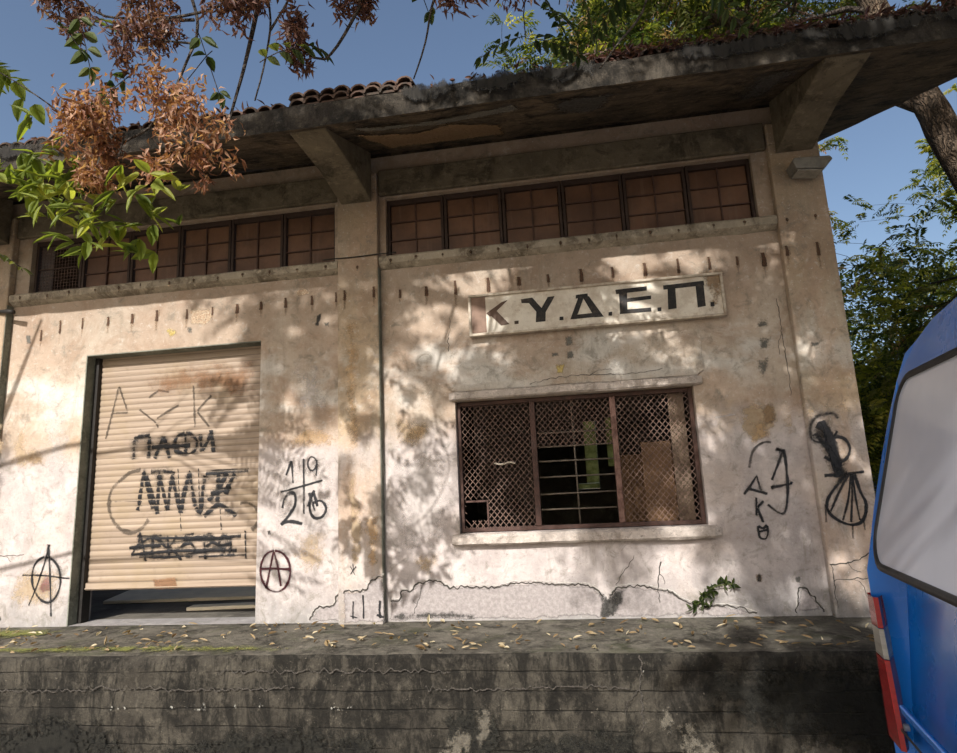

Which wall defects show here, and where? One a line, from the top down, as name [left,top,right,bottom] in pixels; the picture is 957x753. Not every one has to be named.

corrosion [161,372,245,393]
peeling [349,479,378,564]
spalling [309,560,757,622]
crack [657,557,665,602]
crack [830,553,869,603]
damp [166,727,379,753]
damp [442,707,501,753]
damp [520,725,638,753]